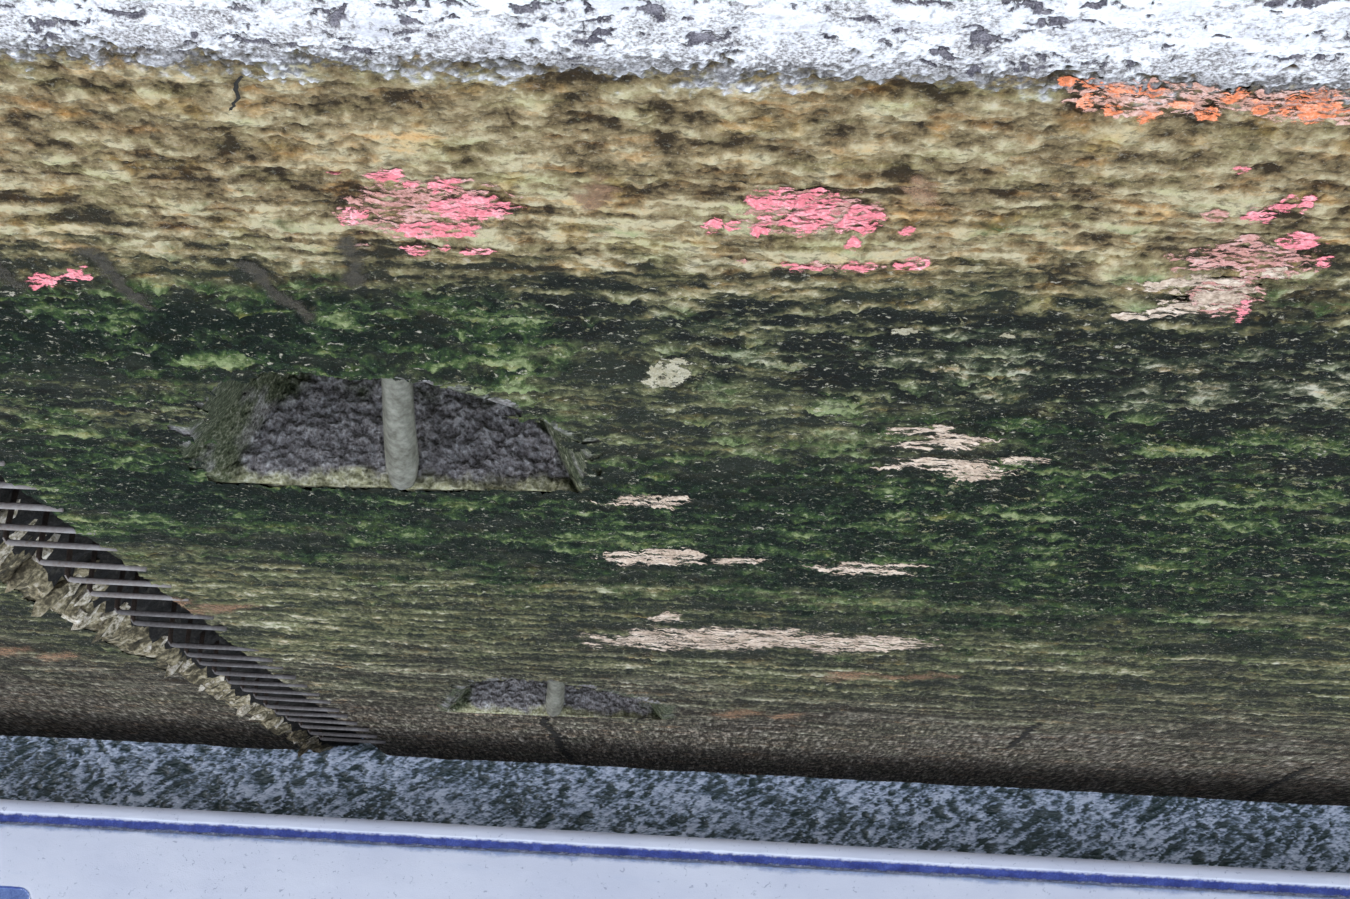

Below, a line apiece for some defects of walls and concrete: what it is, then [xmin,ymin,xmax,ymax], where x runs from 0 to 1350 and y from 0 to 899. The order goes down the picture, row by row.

peeling [850,0,1350,126]
corrosion [902,177,937,204]
damp [235,261,315,321]
spalling [0,499,333,757]